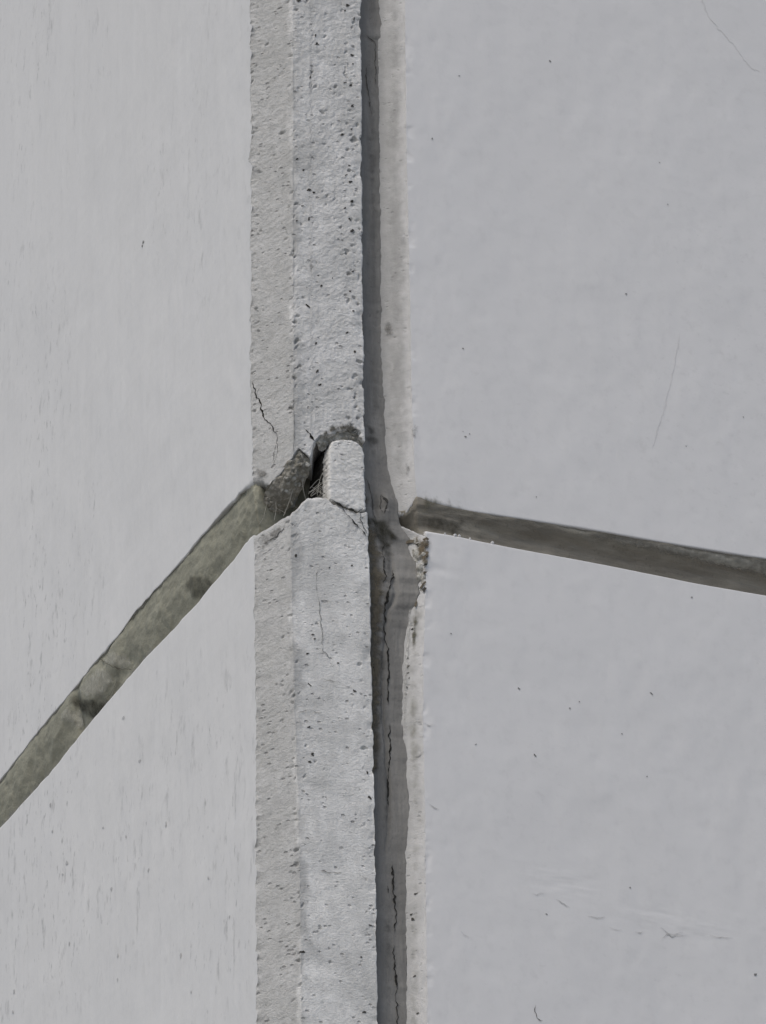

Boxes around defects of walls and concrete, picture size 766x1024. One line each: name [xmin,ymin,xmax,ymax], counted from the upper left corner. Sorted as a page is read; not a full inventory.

crack [252,379,315,460]
spalling [316,430,363,451]
spalling [263,450,311,514]
crack [333,500,366,536]